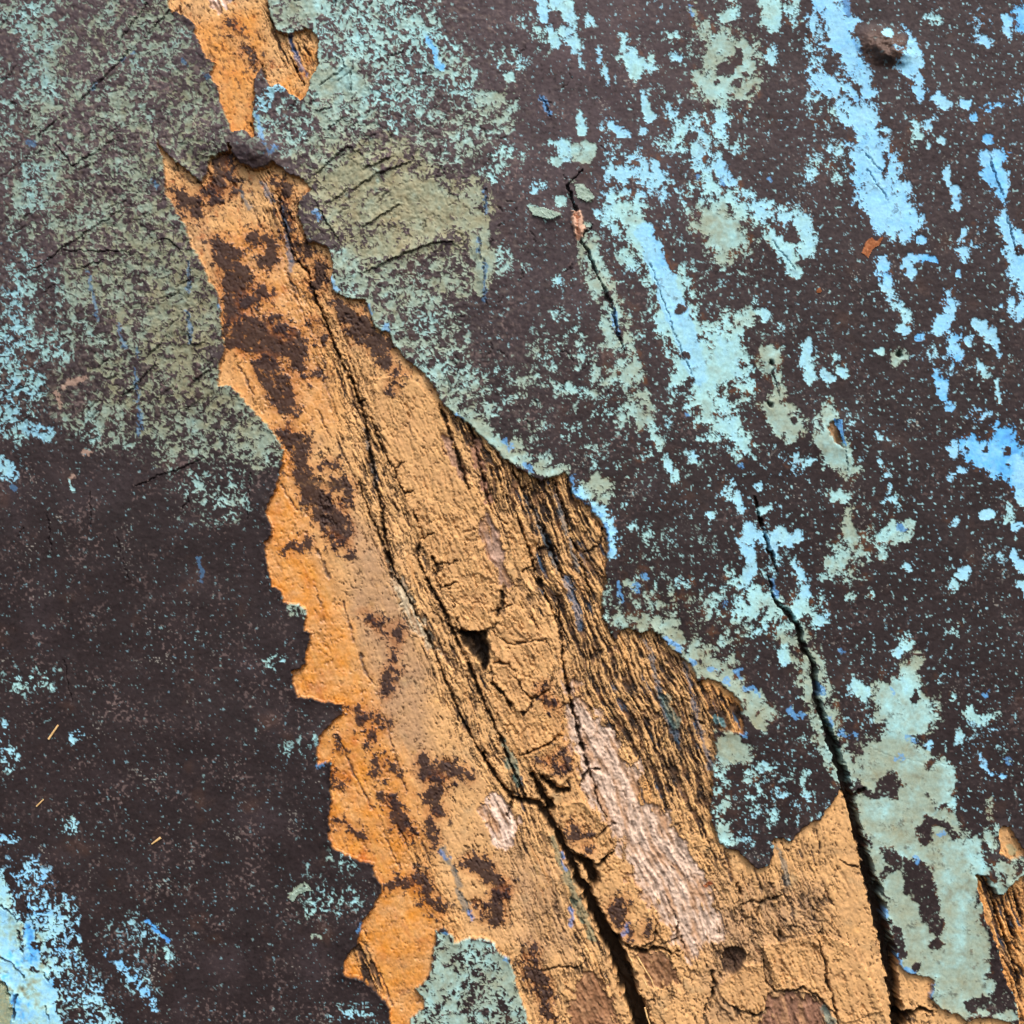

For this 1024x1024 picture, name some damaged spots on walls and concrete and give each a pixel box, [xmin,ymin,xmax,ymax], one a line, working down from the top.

peeling [169,0,574,482]
peeling [527,0,931,602]
peeling [875,220,1003,412]
peeling [942,166,965,213]
peeling [885,25,1024,151]
peeling [970,0,1024,48]
peeling [978,132,1024,321]
crack [275,169,672,1024]
peeling [720,521,840,787]
crack [754,496,1024,1024]
peeling [769,558,1024,1024]
peeling [945,410,1024,534]